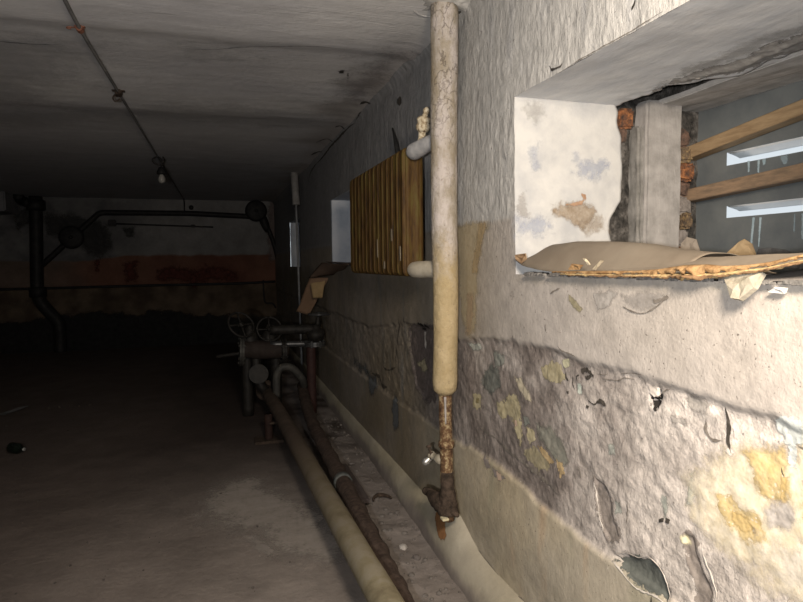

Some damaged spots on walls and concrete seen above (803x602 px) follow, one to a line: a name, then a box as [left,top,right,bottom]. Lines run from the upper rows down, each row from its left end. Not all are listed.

flaking render [408,322,437,405]
peeling [497,377,565,478]
peeling [541,358,606,409]
spalling [649,386,670,411]
corrosion [435,512,446,540]
flaking render [593,476,628,544]
peeling [686,396,803,602]
flaking render [609,552,670,602]
flaking render [680,530,717,602]